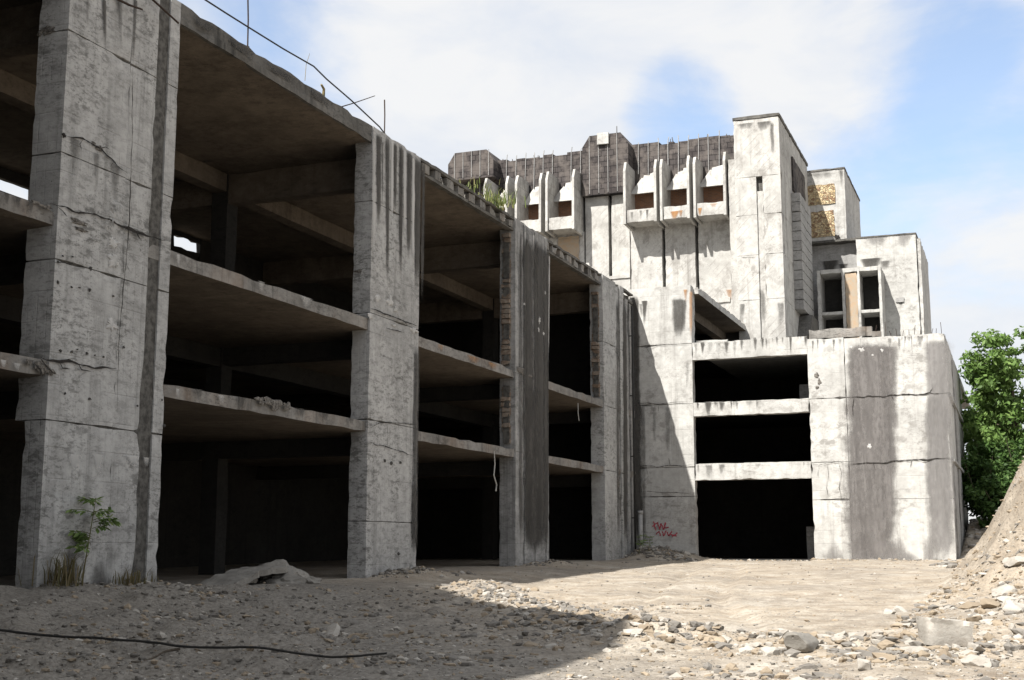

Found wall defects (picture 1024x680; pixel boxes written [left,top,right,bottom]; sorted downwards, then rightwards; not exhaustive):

crack [35,83,168,402]
leakage [373,136,425,282]
leakage [519,232,550,546]
leakage [845,346,911,560]
crack [852,389,940,412]